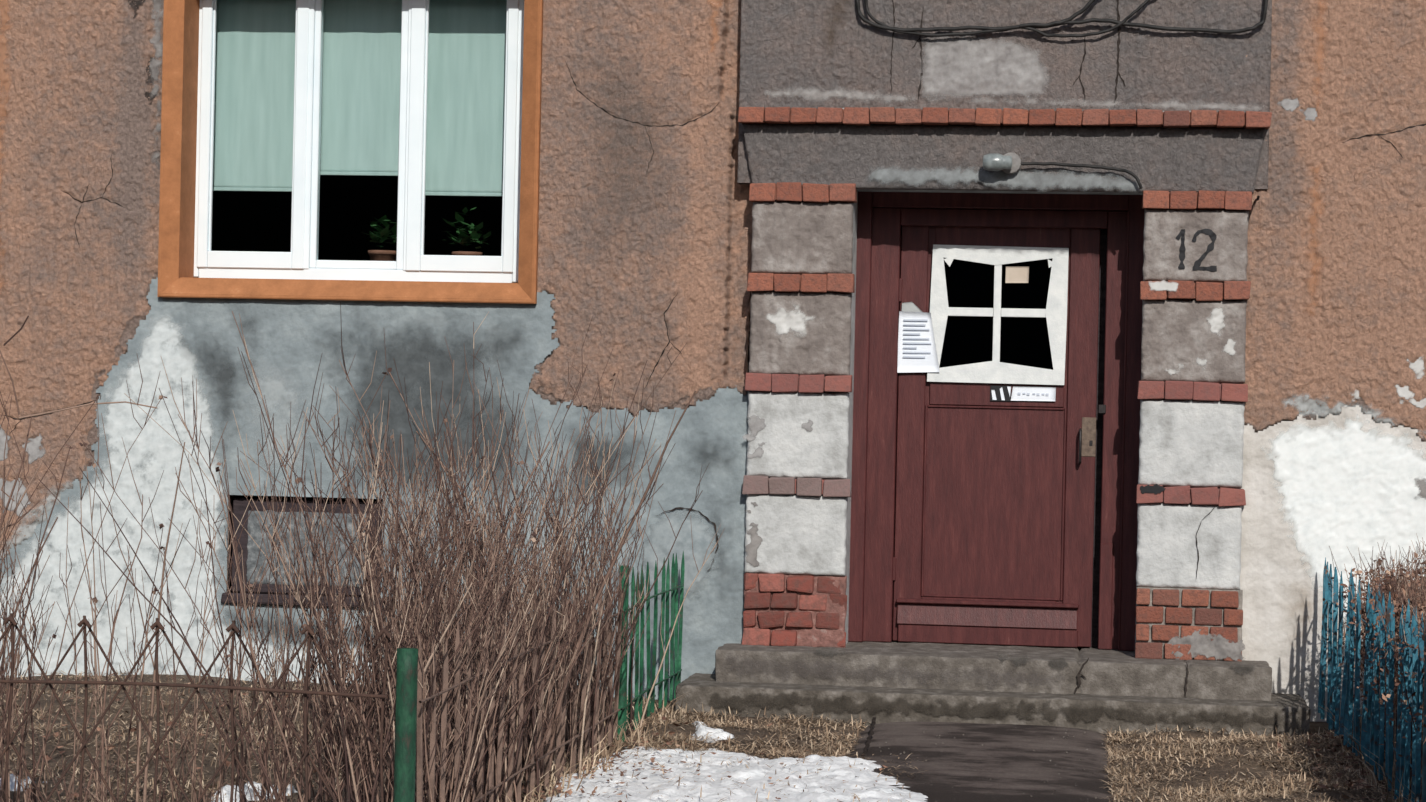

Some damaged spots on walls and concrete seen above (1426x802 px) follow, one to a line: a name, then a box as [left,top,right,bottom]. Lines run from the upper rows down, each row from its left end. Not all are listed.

peeling [0,277,766,701]
peeling [1167,390,1426,722]
peeling [1395,357,1426,408]